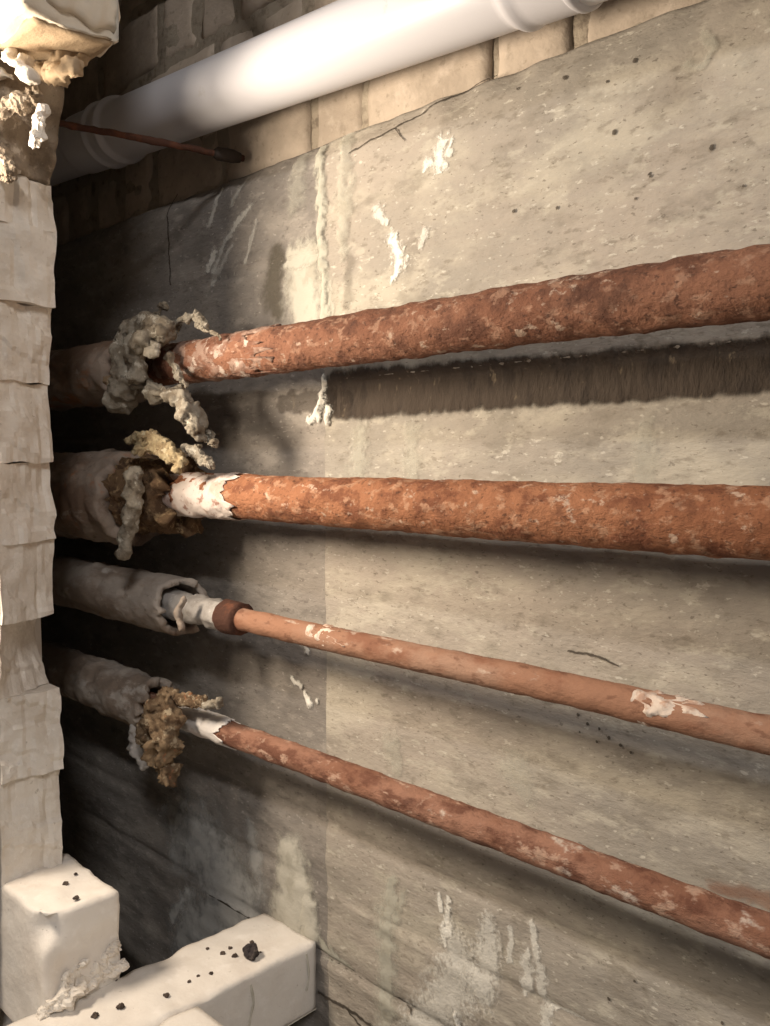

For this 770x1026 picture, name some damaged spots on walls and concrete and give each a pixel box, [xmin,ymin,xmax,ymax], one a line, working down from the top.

damp [422,132,453,175]
damp [206,206,251,274]
damp [373,205,428,285]
damp [265,246,284,317]
damp [375,877,586,1026]